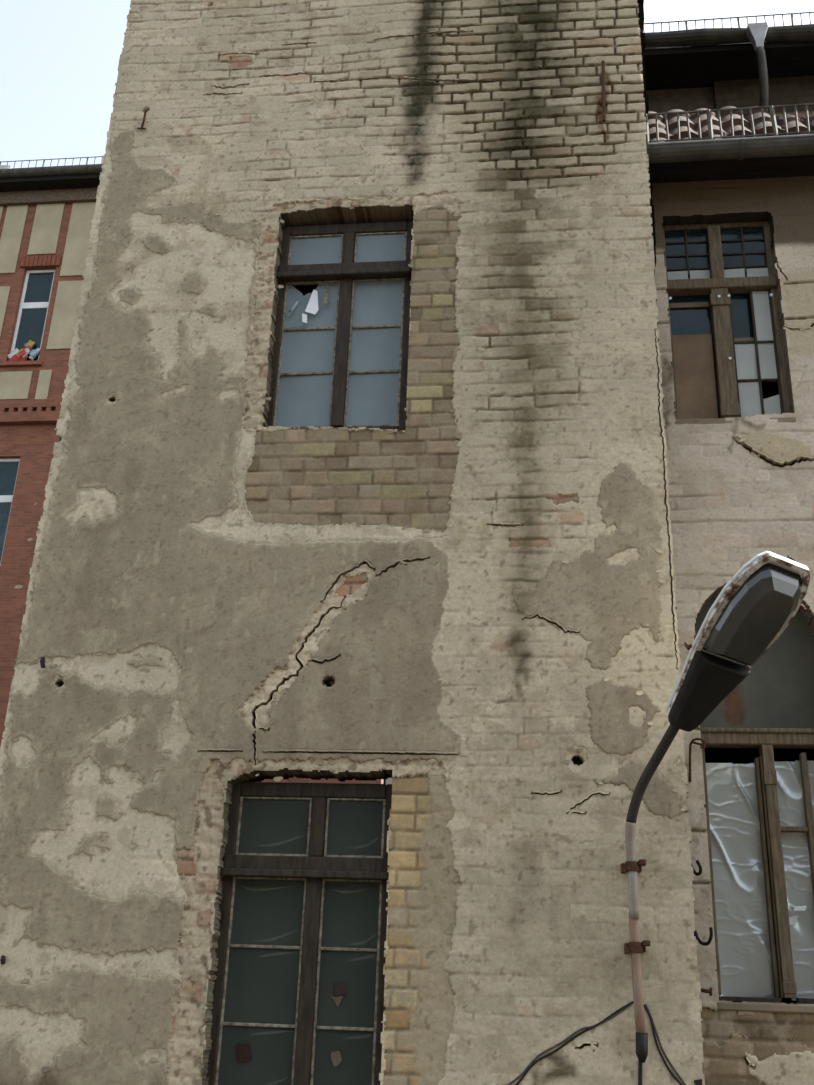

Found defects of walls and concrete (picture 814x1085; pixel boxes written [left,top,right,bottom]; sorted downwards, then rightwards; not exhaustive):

peeling [14,118,119,645]
peeling [108,210,261,403]
flaking render [190,203,462,545]
flaking render [546,494,579,505]
peeling [735,430,814,462]
peeling [0,643,194,791]
crack [198,556,458,764]
peeling [29,757,195,901]
peeling [0,882,184,986]
flaking render [383,771,461,1085]
flaking render [701,1008,814,1085]